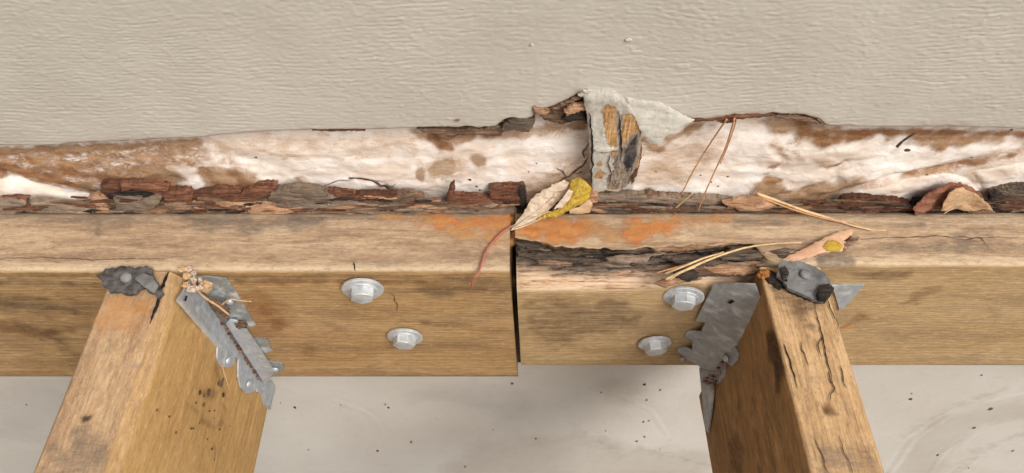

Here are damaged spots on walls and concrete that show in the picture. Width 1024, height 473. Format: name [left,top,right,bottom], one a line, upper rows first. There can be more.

damp [0,139,261,193]
peeling [113,193,162,211]
damp [411,122,587,181]
rust [428,214,678,244]
damp [526,149,590,204]
peeling [583,88,694,192]
damp [642,124,713,185]
damp [751,166,891,201]
damp [764,118,1024,190]
crack [2,257,169,323]
crack [784,299,847,400]